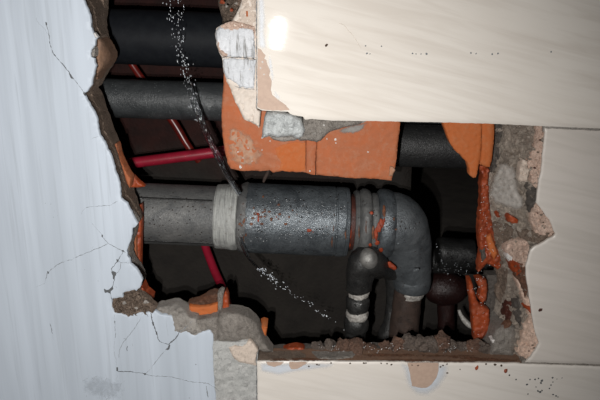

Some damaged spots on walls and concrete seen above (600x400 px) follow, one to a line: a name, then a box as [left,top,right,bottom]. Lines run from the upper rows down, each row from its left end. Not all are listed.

crack [36,19,86,96]
peeling [215,0,289,127]
spalling [86,0,202,335]
crack [37,225,127,299]
spalling [213,124,554,400]
crack [106,314,215,400]